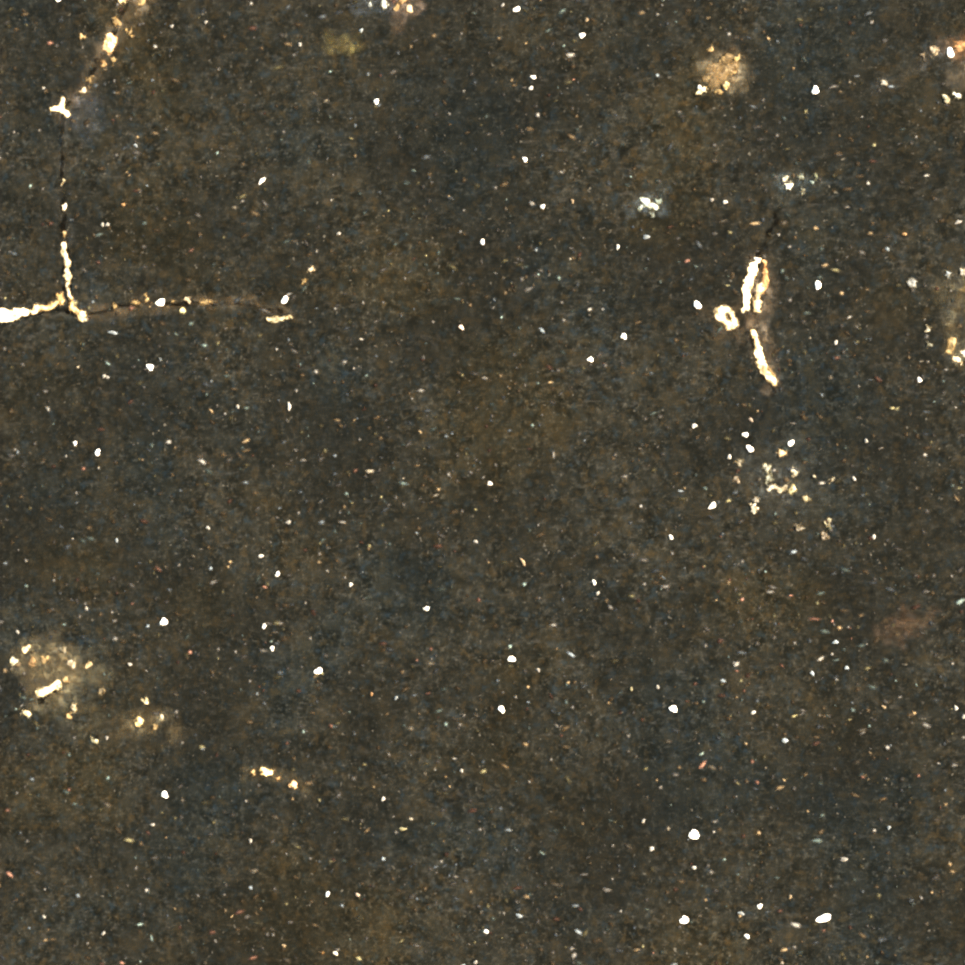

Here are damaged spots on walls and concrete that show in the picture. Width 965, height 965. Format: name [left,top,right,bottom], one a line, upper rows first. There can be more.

crack [0,0,213,322]
crack [266,309,293,323]
crack [741,212,779,386]